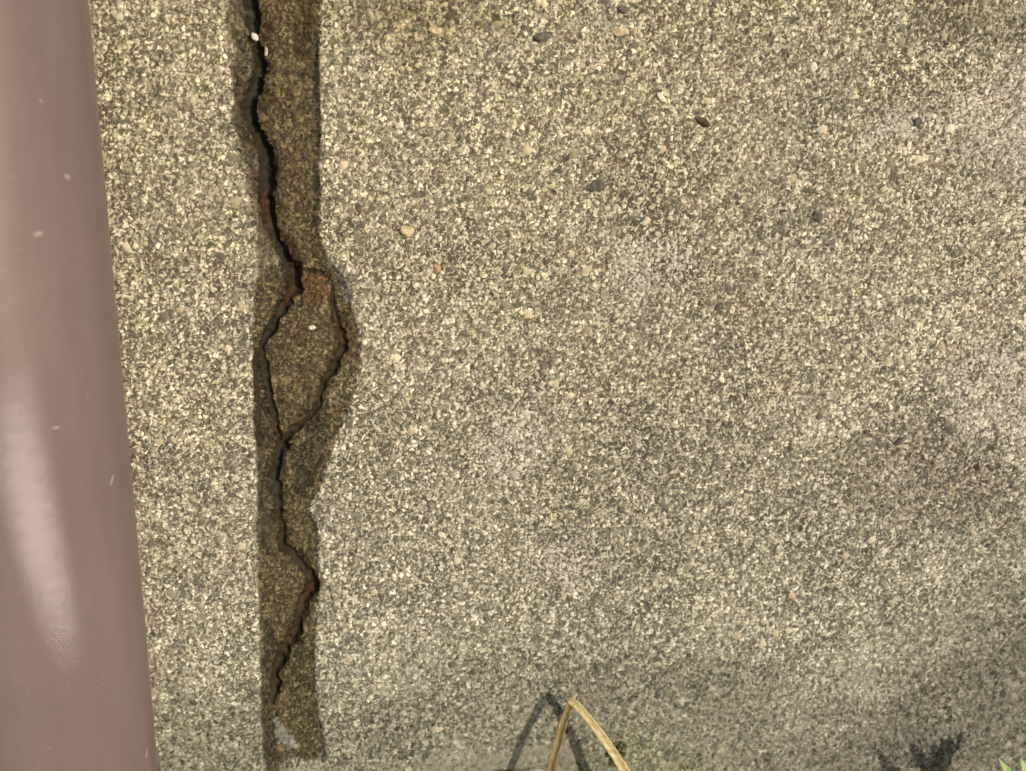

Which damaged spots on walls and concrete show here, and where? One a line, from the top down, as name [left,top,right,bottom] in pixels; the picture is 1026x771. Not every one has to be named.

crack [242,0,349,705]